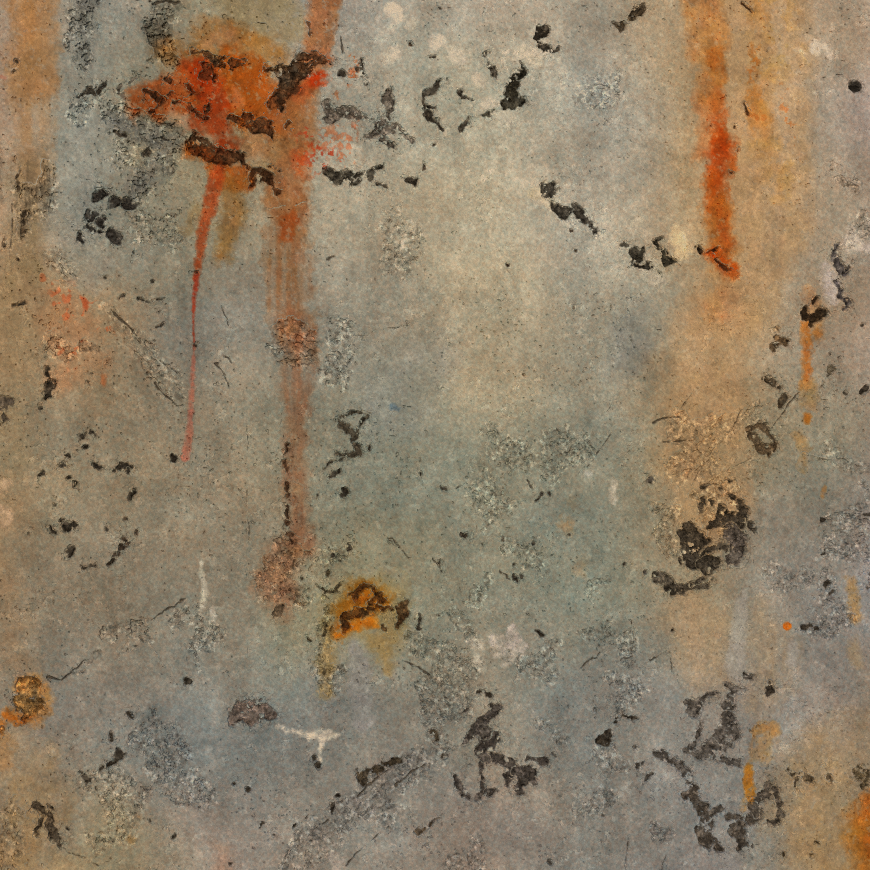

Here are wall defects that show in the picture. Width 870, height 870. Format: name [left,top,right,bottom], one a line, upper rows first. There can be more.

peeling [64,47,284,250]
corrosion [123,0,366,462]
spalling [227,51,370,141]
spalling [539,178,606,240]
corrosion [676,0,812,328]
corrosion [274,349,323,579]
spalling [643,475,757,604]
corrosion [330,575,398,645]
corrosion [0,671,57,740]
spalling [451,686,572,804]
spalling [572,620,835,859]
corrosion [833,788,870,870]